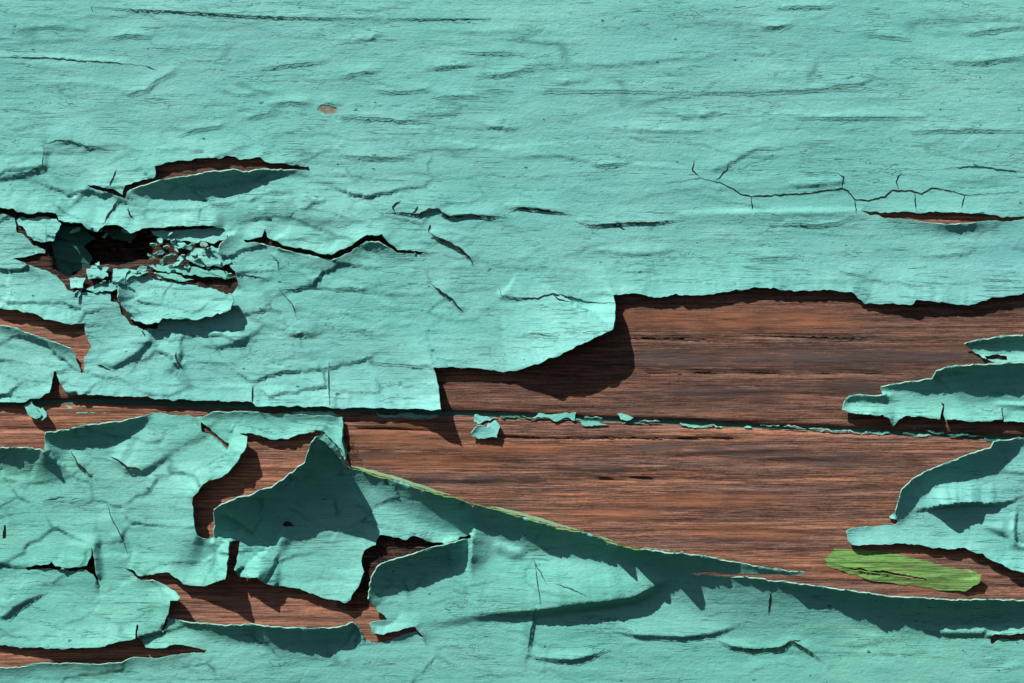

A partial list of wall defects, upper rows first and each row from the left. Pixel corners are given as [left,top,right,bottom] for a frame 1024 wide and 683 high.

peeling [82,142,325,214]
crack [382,201,683,265]
crack [668,162,1020,225]
peeling [853,203,1024,237]
peeling [0,216,441,378]
peeling [0,273,1024,680]